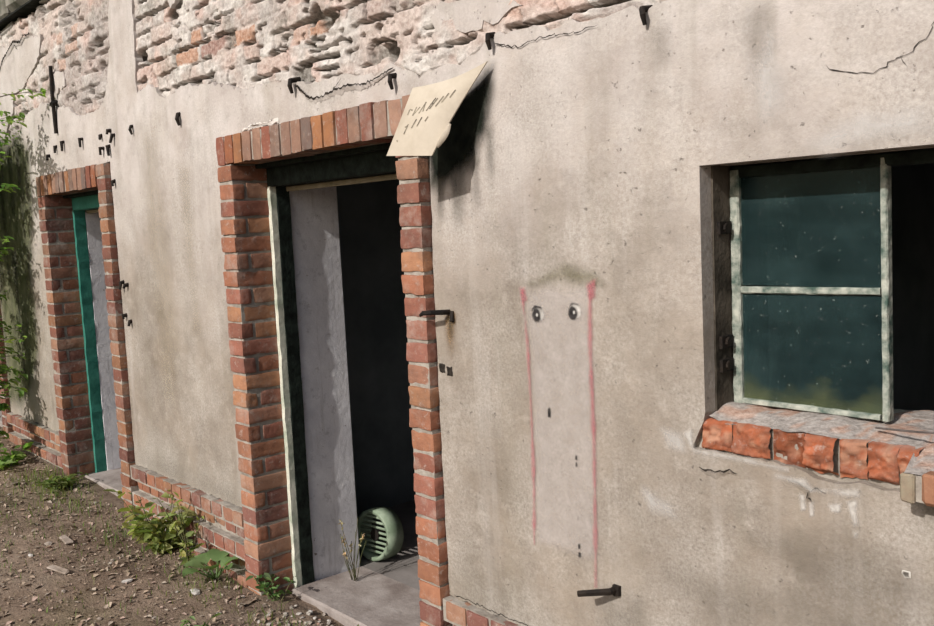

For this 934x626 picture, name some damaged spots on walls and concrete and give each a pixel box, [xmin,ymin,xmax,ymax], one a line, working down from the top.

spalling [0,0,110,143]
crack [295,68,394,104]
spalling [134,0,666,97]
crack [494,26,594,48]
crack [829,22,934,74]
spalling [242,118,279,131]